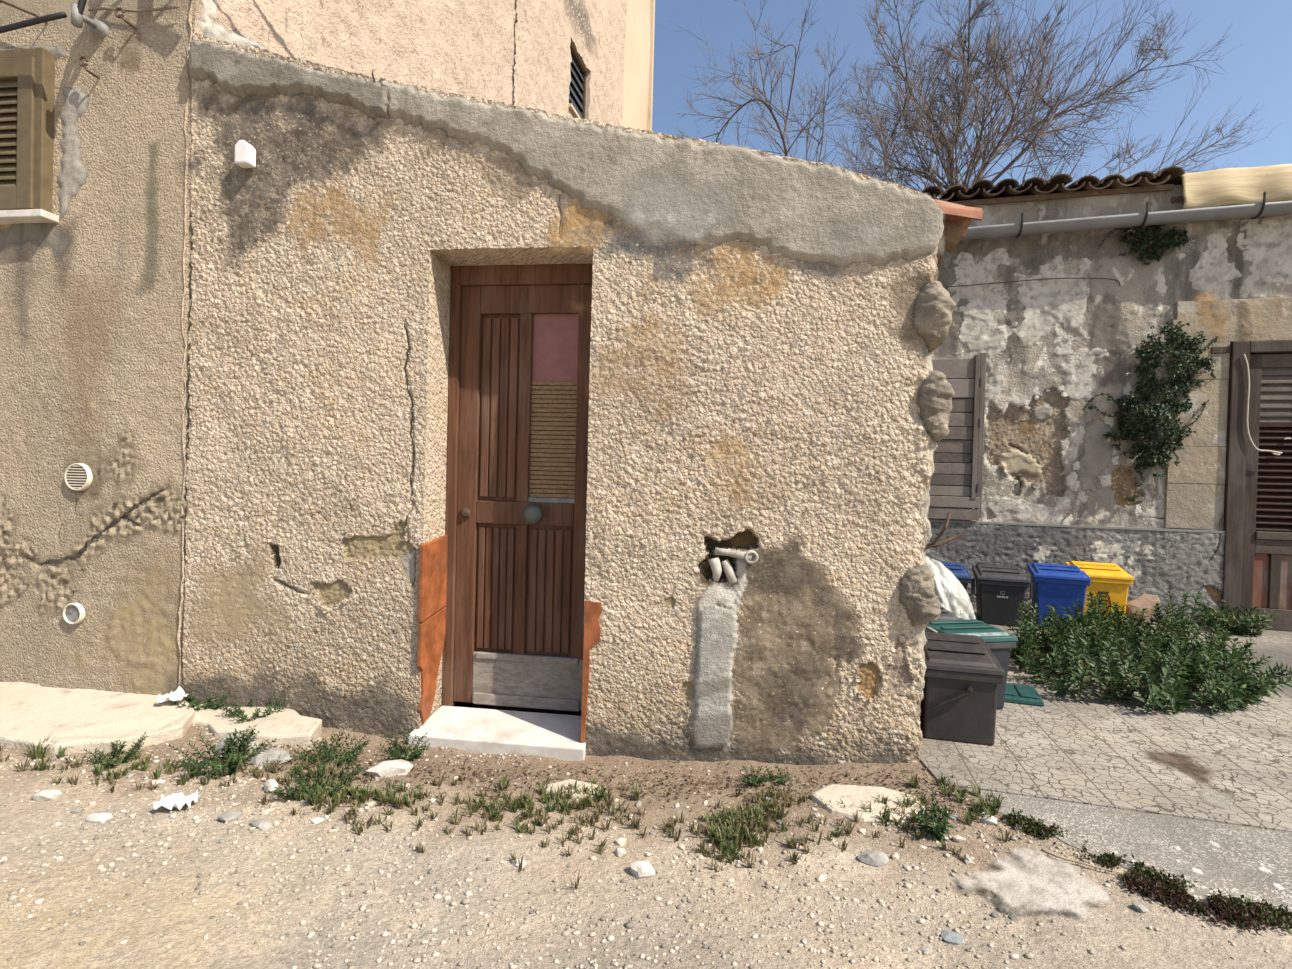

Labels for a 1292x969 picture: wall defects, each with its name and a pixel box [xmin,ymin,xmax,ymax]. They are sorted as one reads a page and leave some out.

crack [511,0,519,105]
leakage [198,95,381,250]
peeling [1177,215,1292,301]
crack [22,209,193,565]
peeling [948,248,1109,524]
spalling [0,431,188,615]
spalling [270,544,281,568]
spalling [310,580,352,613]
spalling [344,522,416,587]
spalling [699,530,759,605]
leakage [578,542,862,765]
leakage [872,753,899,764]